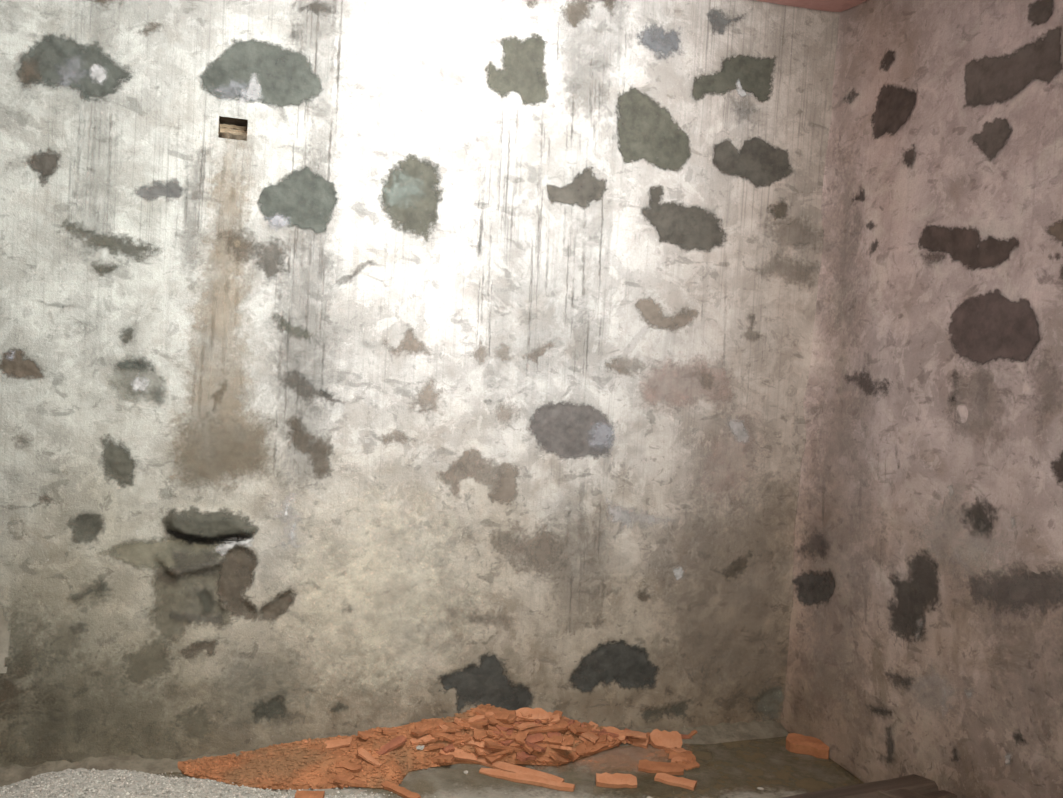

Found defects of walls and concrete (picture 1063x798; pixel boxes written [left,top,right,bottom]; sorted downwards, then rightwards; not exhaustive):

flaking render [18,34,132,100]
flaking render [200,39,322,107]
flaking render [485,33,548,105]
flaking render [964,0,1063,108]
flaking render [226,166,337,277]
flaking render [381,154,443,241]
flaking render [616,87,691,171]
flaking render [642,186,726,252]
flaking render [713,137,793,187]
flaking render [948,289,1040,364]
flaking render [529,402,614,459]
flaking render [105,507,296,646]